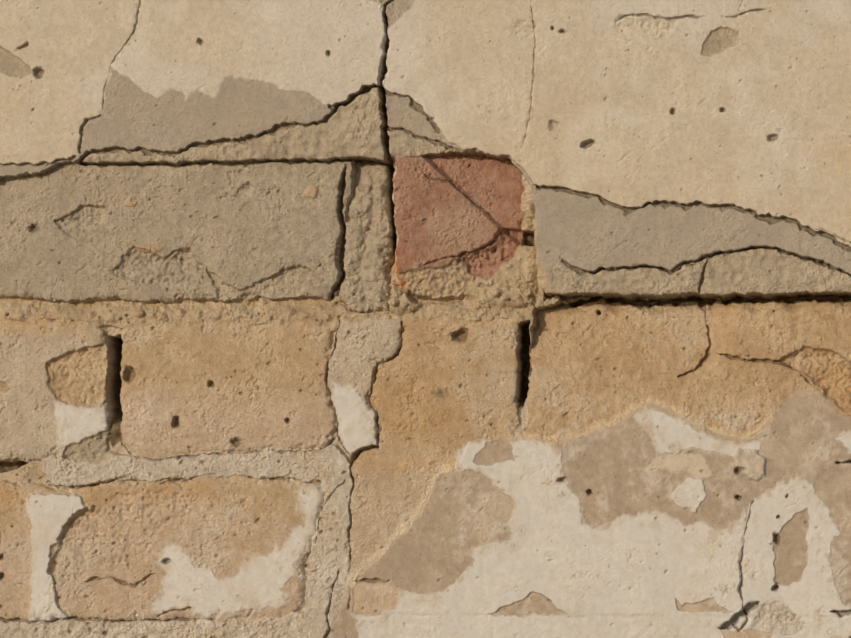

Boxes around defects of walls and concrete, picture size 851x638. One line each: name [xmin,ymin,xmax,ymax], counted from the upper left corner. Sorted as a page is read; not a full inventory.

crack [78,0,141,155]
crack [359,0,398,258]
peeling [0,67,851,305]
crack [615,0,769,26]
spalling [47,344,116,464]
crack [46,164,404,638]
peeling [332,383,377,454]
crack [0,607,218,624]
peeling [26,484,327,621]
peeling [351,408,851,638]
crack [719,500,760,632]
crack [830,610,851,618]